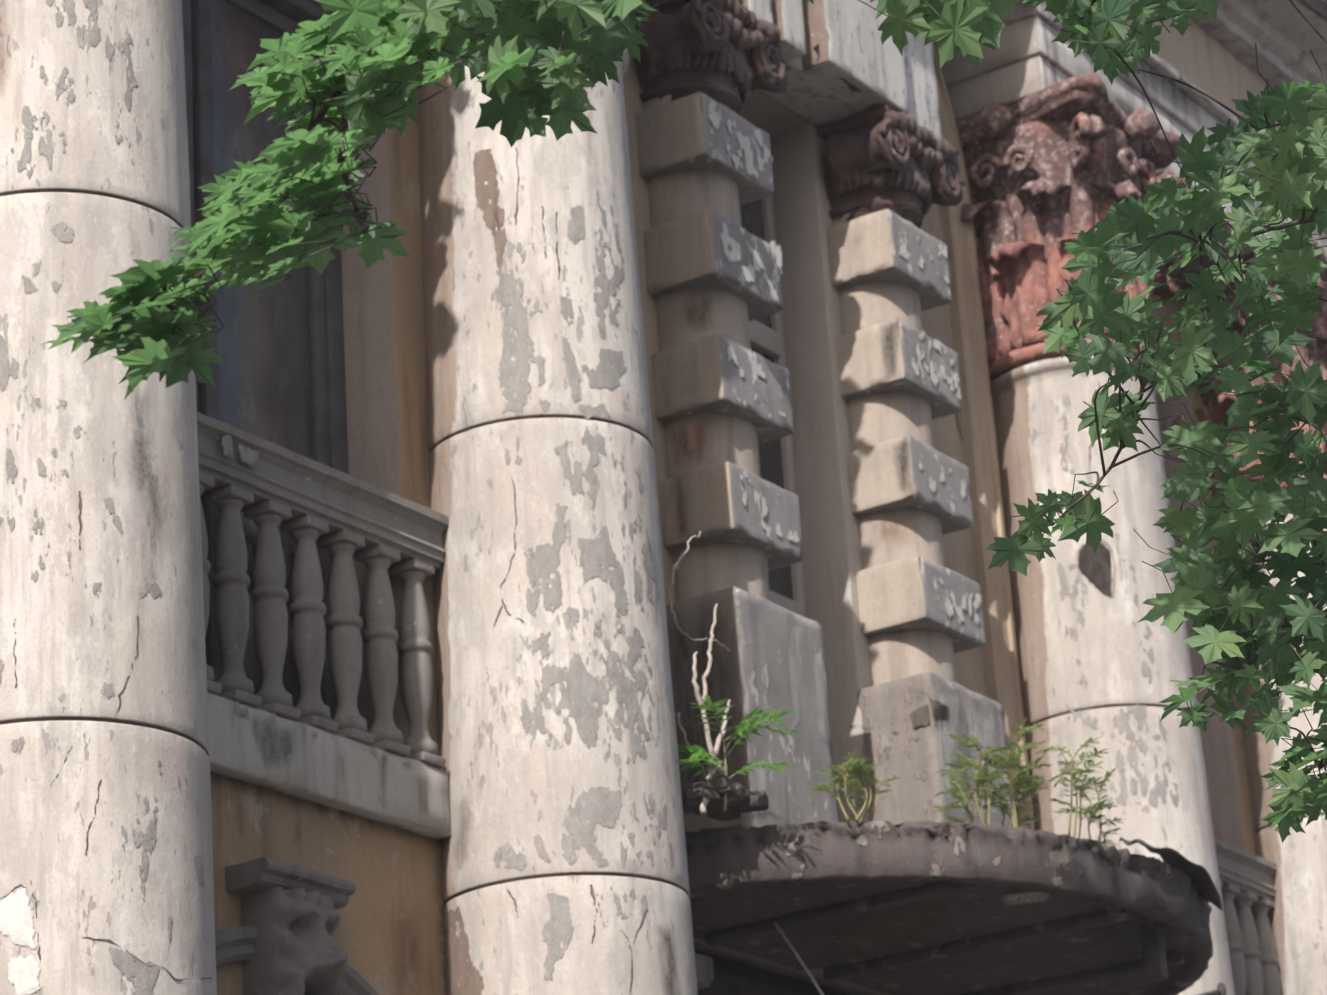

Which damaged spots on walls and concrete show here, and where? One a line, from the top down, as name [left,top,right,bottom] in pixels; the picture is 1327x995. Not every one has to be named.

peeling [40,0,138,164]
peeling [10,106,67,186]
peeling [708,103,774,184]
peeling [896,231,949,283]
peeling [473,149,660,764]
crack [493,477,524,627]
peeling [11,736,25,754]
peeling [121,796,171,901]
spalling [109,947,159,995]
crack [81,937,212,981]